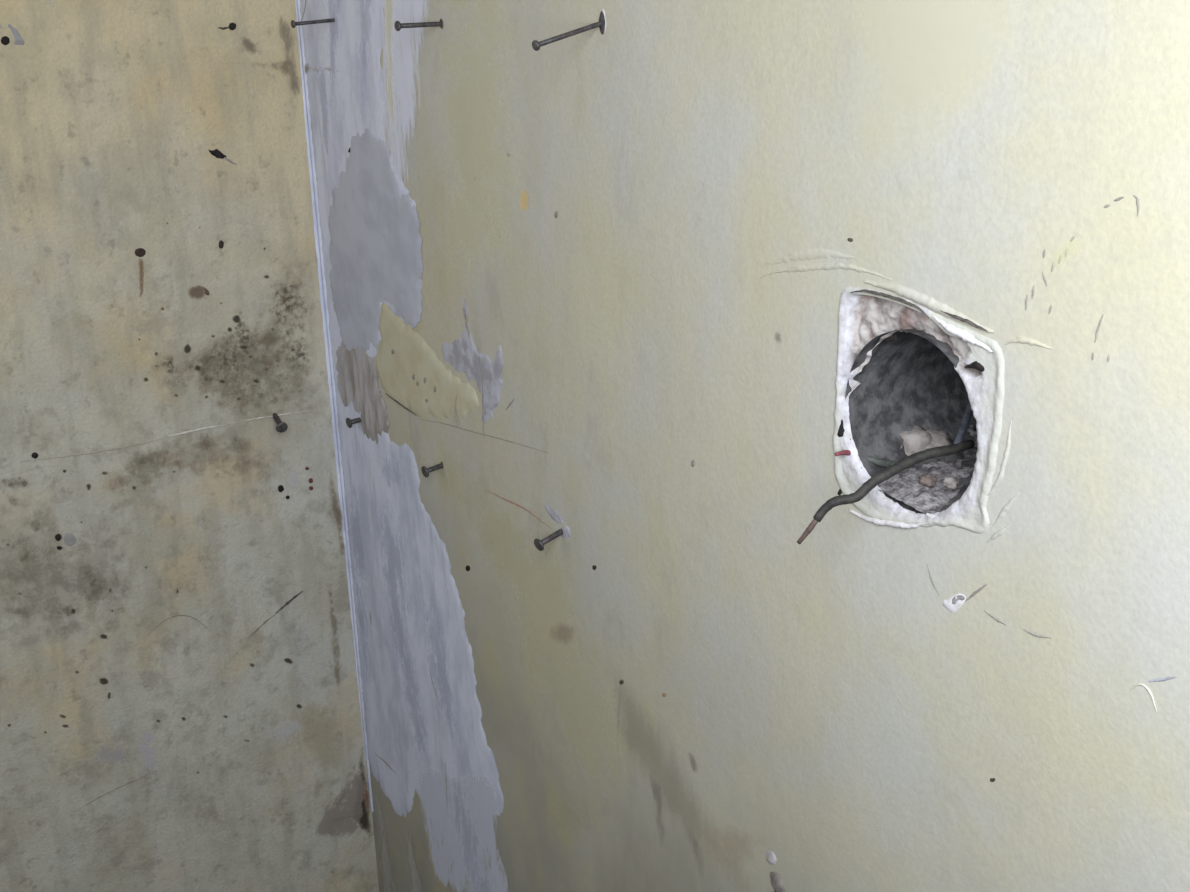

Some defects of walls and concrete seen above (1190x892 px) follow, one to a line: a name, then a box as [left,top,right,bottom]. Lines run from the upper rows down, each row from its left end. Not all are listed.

water stain [144,275,307,410]
peeling [295,0,508,892]
spalling [759,248,1052,543]